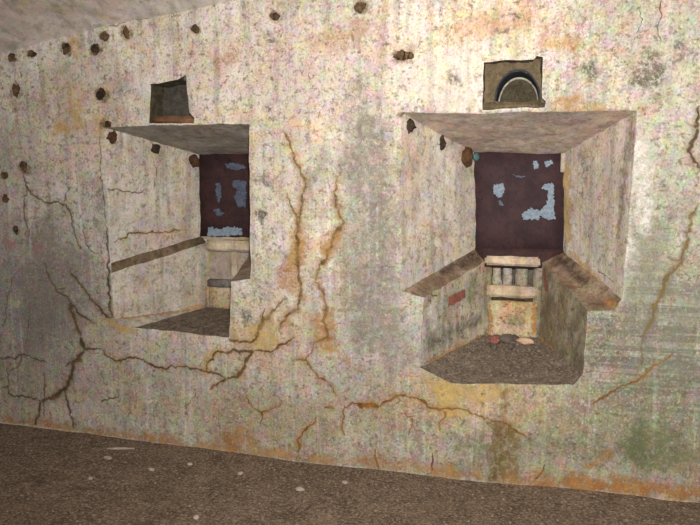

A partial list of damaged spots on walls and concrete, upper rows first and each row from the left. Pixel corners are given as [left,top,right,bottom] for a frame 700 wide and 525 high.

spalling [91,31,109,55]
spalling [95,87,109,102]
crack [687,109,700,168]
peeling [213,183,224,216]
peeling [232,176,266,208]
peeling [493,183,505,206]
peeling [522,183,556,220]
peeling [207,226,242,237]
crack [2,135,526,451]
crack [594,209,696,403]
damp [621,421,695,471]
corrosion [568,475,700,498]